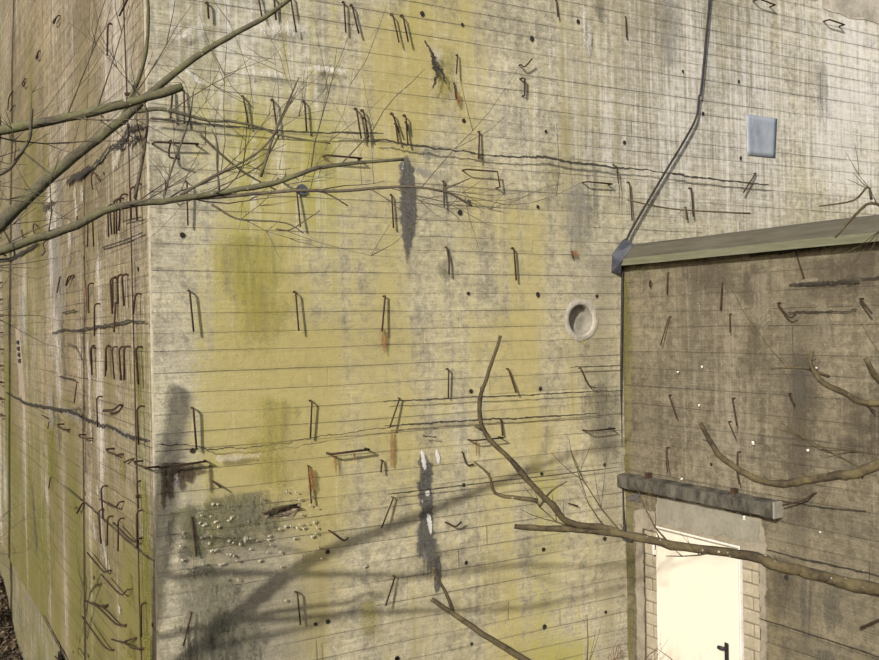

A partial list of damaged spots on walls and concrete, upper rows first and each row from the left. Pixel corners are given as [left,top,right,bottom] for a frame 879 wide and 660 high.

crack [424,40,447,88]
leakage [398,156,417,260]
peeling [181,490,323,581]
leakage [417,449,441,593]
crack [43,616,66,660]